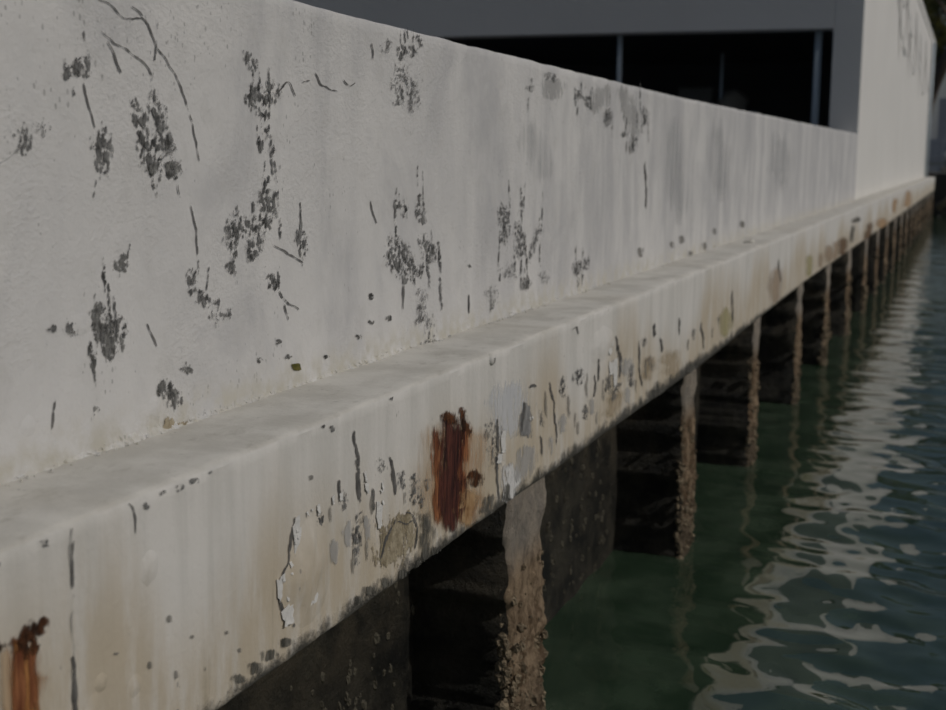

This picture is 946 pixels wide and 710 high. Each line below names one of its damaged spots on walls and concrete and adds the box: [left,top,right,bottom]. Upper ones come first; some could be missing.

crack [83,84,95,127]
crack [100,0,200,160]
corrosion [426,407,483,532]
spalling [233,431,441,683]
corrosion [0,616,49,710]